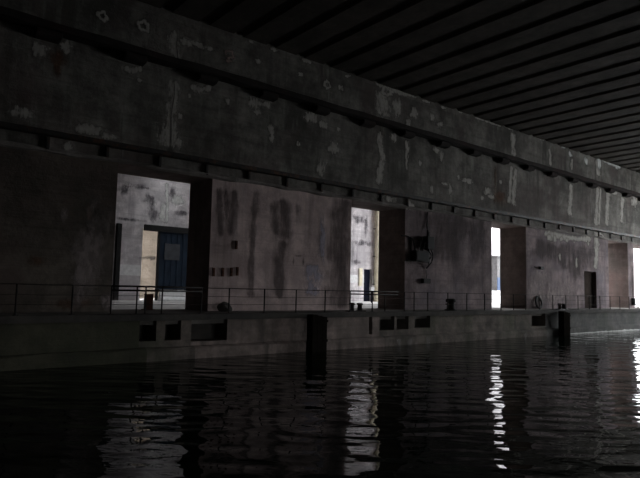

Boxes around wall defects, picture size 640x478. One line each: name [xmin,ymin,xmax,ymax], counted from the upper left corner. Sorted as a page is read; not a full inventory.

efflorescence [375,132,385,185]
efflorescence [507,165,517,206]
water stain [273,200,289,297]
water stain [536,187,638,278]